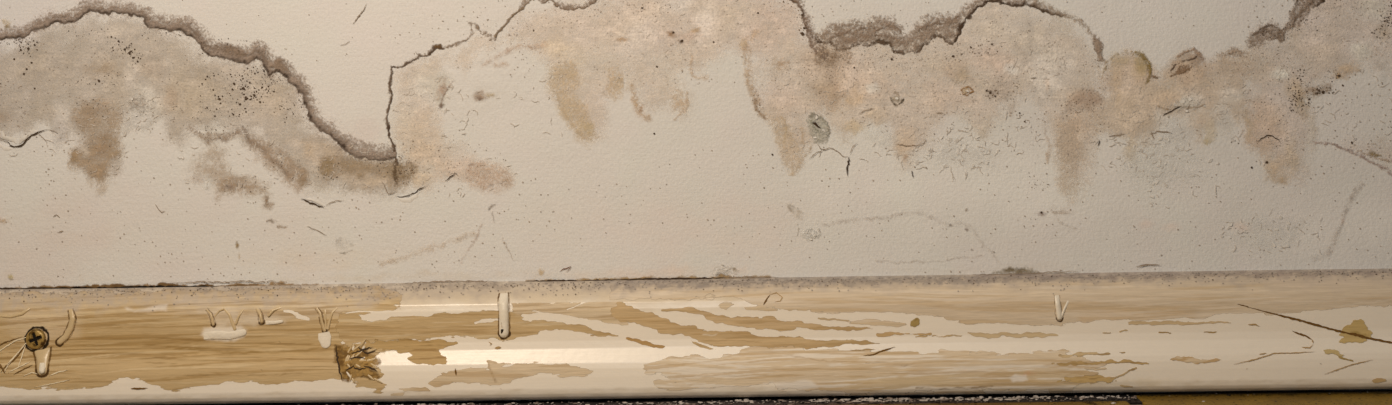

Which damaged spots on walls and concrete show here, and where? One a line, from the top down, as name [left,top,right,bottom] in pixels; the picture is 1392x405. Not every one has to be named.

crack [0,129,57,151]
water stain [0,0,1392,228]
flaking render [807,112,830,143]
peeling [0,263,1392,396]